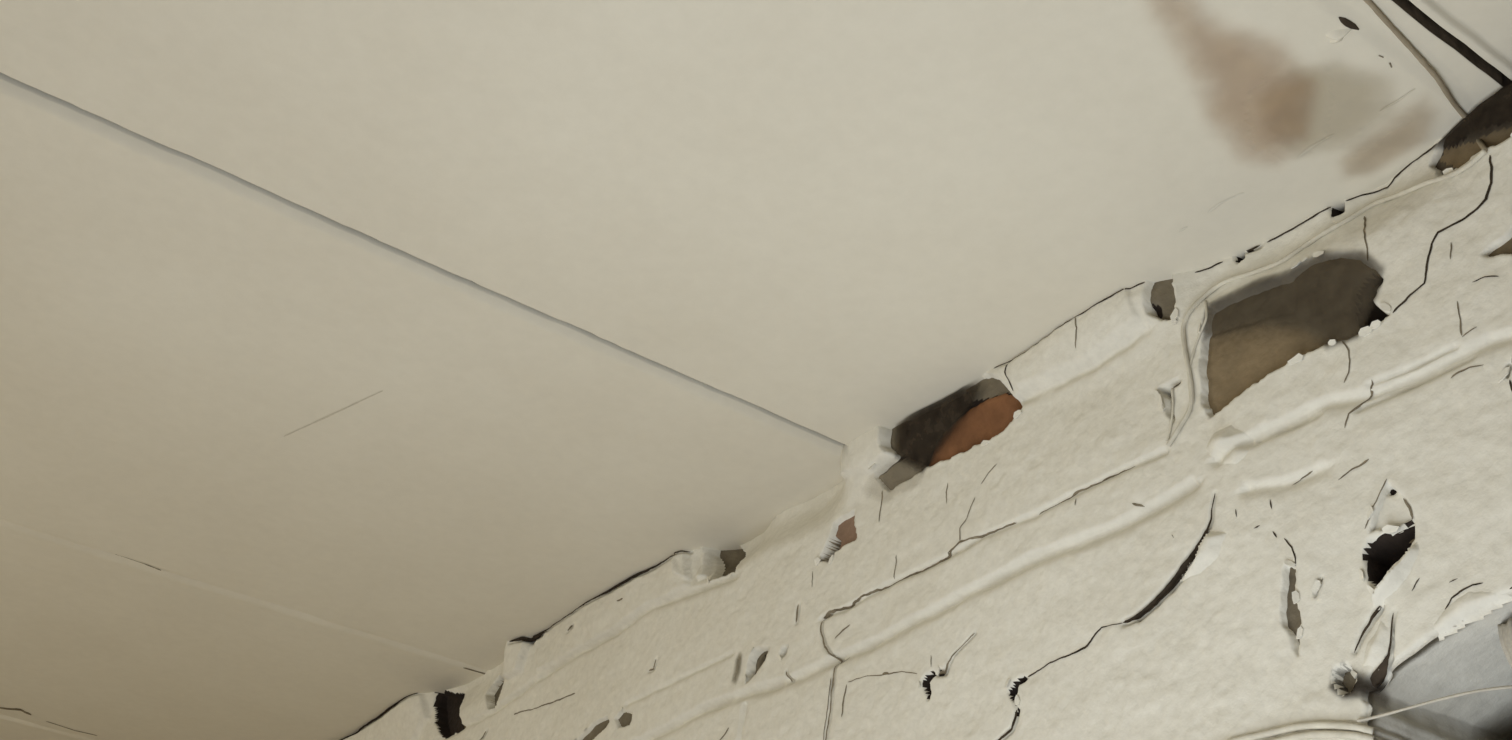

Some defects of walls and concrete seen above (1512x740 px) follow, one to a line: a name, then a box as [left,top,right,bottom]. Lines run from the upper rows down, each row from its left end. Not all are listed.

spalling [1476,73,1512,108]
spalling [1435,124,1512,175]
peeling [1488,238,1512,257]
spalling [1150,279,1179,325]
spalling [1357,274,1392,337]
spalling [1197,323,1340,415]
crack [1342,341,1373,428]
spalling [868,378,1023,490]
spalling [814,516,857,566]
peeling [1367,489,1415,566]
crack [796,465,1145,740]
crack [998,459,1413,740]